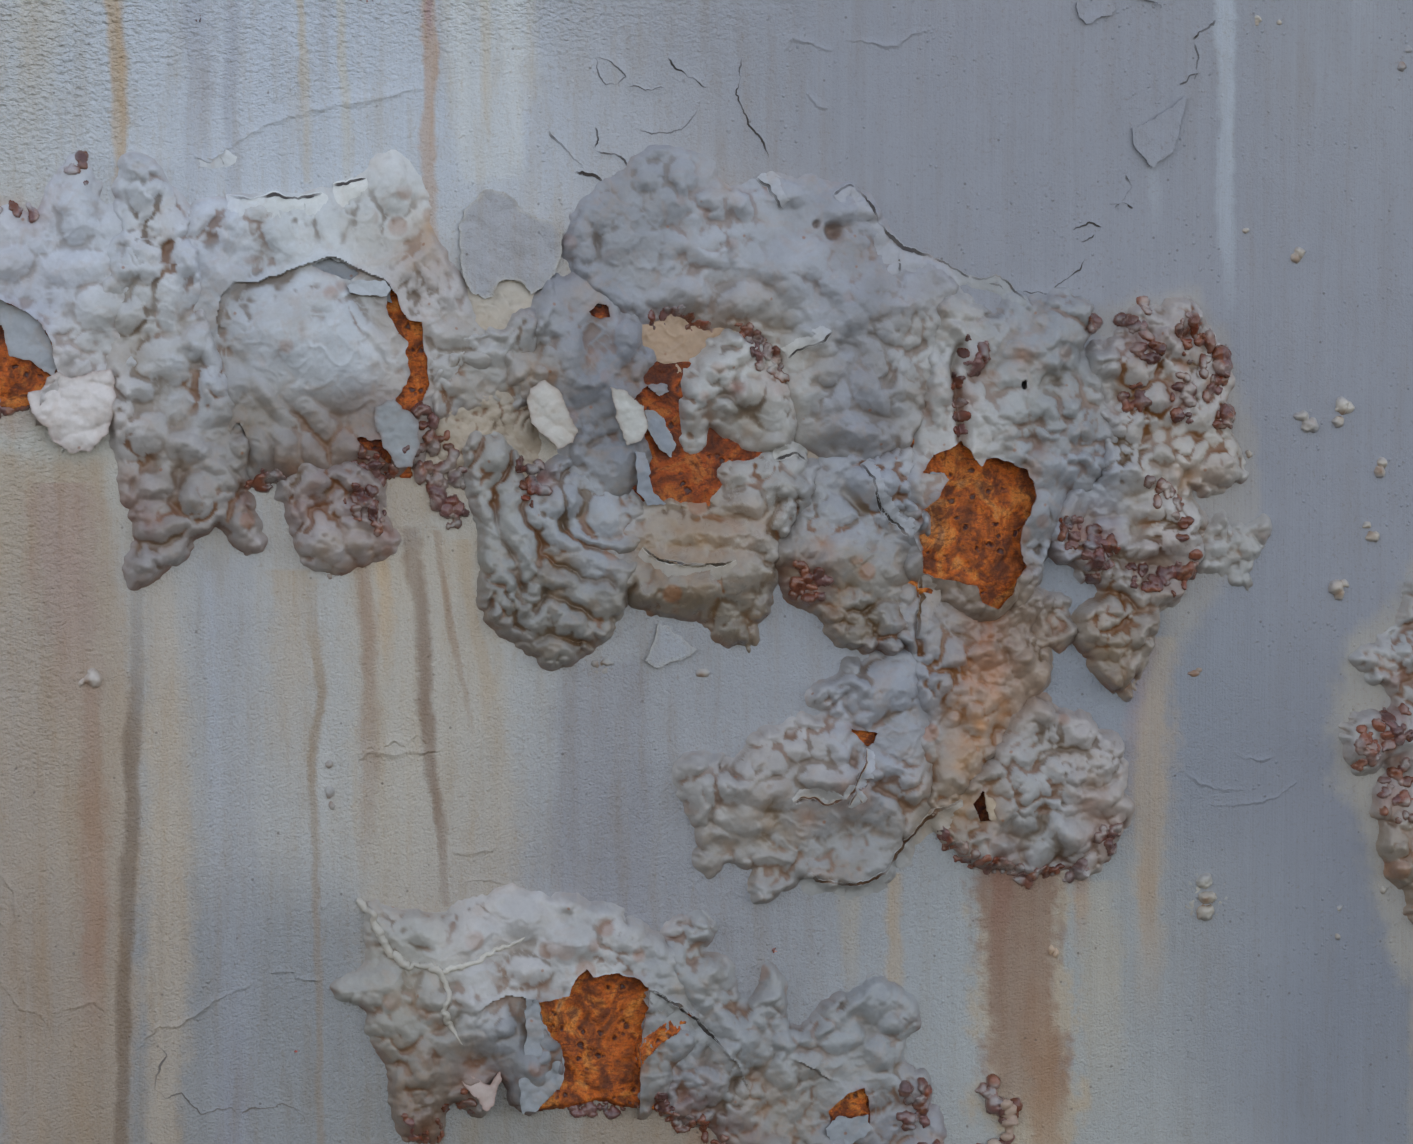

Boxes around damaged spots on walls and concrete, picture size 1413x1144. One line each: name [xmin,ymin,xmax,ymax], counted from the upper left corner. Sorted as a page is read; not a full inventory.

rust [0,188,39,212]
rust [100,0,133,201]
peeling [458,189,564,299]
crack [539,50,790,210]
peeling [1132,95,1188,168]
rust [0,407,48,449]
rust [1087,276,1265,526]
rust [111,570,203,1144]
rust [945,573,1232,1144]